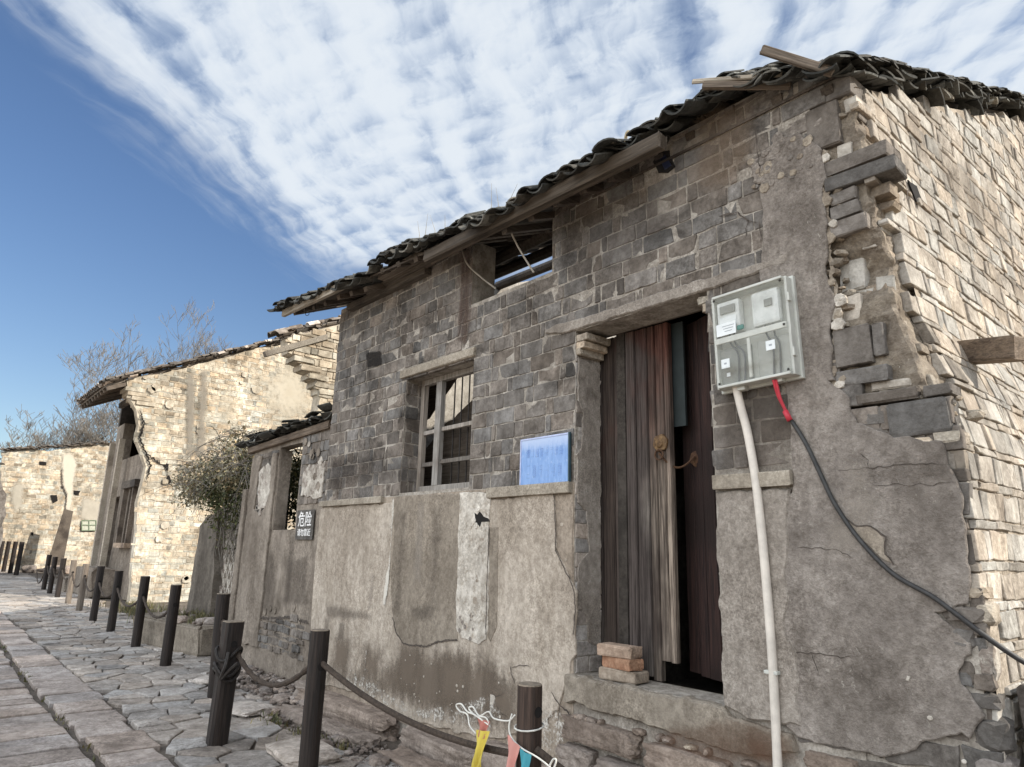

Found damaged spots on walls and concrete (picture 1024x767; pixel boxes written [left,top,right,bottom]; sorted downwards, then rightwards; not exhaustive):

spalling [747,73,987,445]
crack [139,411,163,482]
peeling [255,450,279,516]
flaking render [297,430,330,505]
crack [839,455,959,486]
peeling [391,492,499,647]
flaking render [258,603,310,662]
leakage [331,639,516,726]